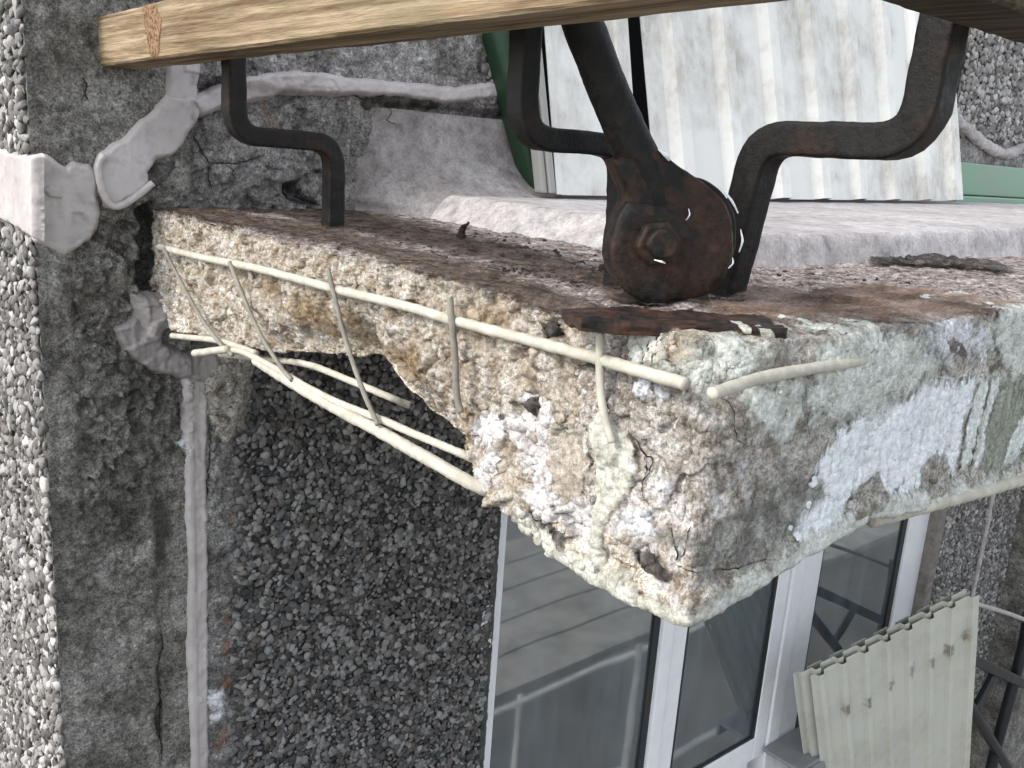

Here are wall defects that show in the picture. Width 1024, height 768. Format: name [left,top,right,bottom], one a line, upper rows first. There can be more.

crack [192,133,256,194]
corrosion [167,206,654,339]
corrosion [710,282,1020,324]
spalling [169,212,983,610]
crack [606,399,653,505]
crack [721,398,743,444]
crack [671,526,790,573]
crack [156,623,164,706]